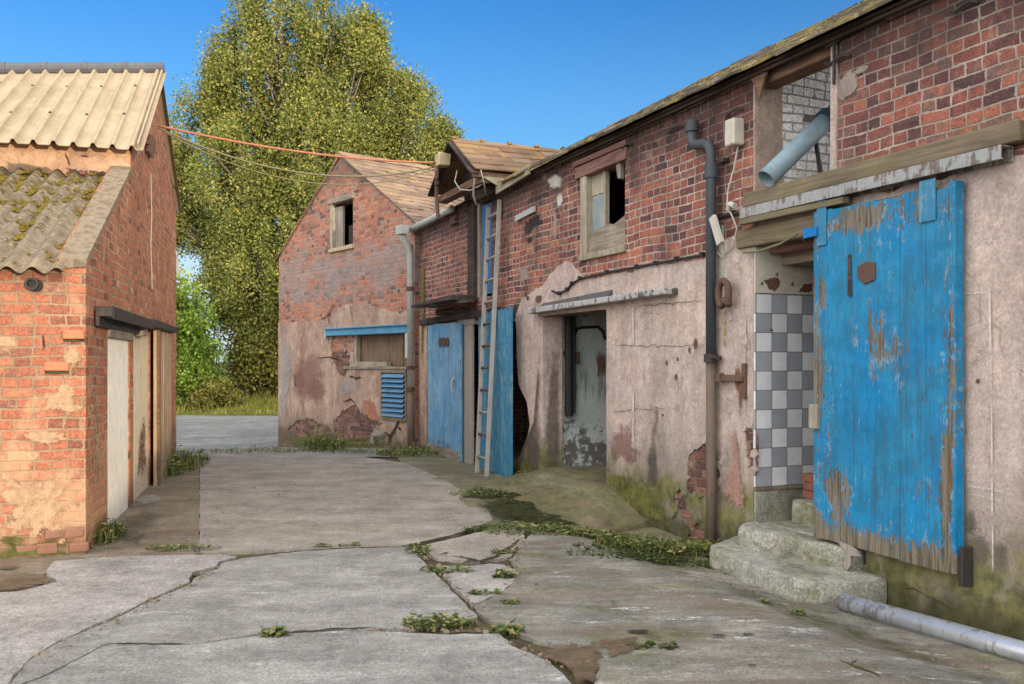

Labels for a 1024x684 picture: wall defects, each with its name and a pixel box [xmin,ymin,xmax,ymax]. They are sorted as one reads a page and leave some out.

spalling [332,347,352,379]
spalling [289,398,383,441]
spalling [673,419,759,544]
crack [245,512,520,564]
crack [109,639,191,647]
crack [291,626,370,634]